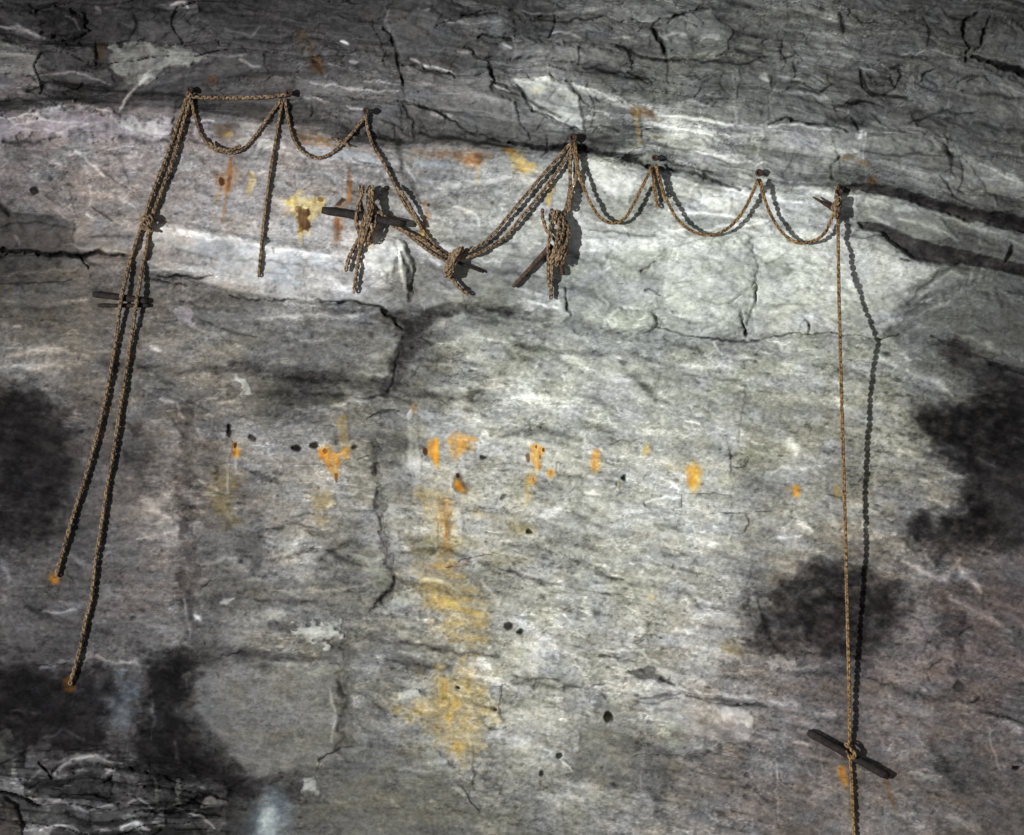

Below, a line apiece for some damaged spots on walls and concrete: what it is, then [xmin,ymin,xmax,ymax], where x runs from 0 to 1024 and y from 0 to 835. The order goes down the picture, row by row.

rust [210,118,242,225]
rust [280,168,380,248]
crack [382,7,744,192]
crack [838,12,846,34]
crack [906,12,1024,85]
damp [0,368,92,559]
crack [150,273,432,772]
damp [266,619,321,635]
rust [303,414,354,531]
rust [386,429,558,775]
damp [732,333,1024,696]
damp [0,639,340,835]